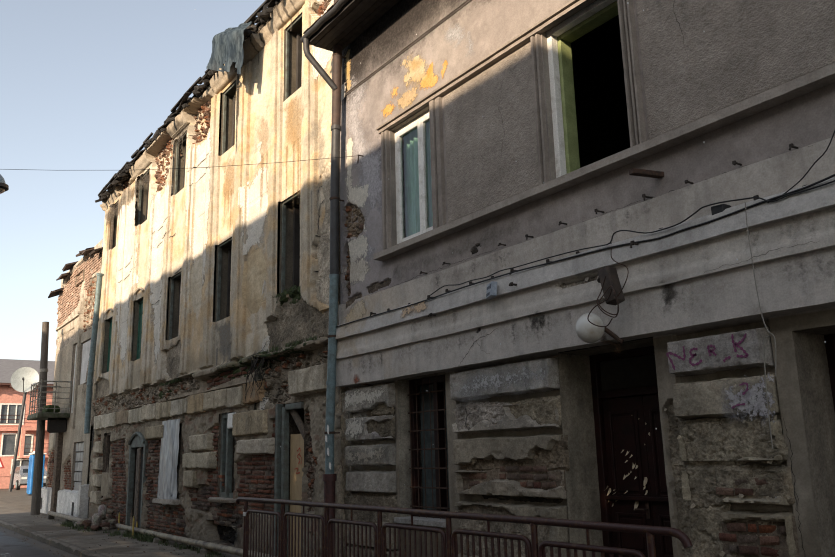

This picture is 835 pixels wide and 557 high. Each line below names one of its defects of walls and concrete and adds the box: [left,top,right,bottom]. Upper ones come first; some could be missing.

peeling [381,55,448,117]
leakage [286,100,301,194]
spalling [56,252,102,355]
peeling [83,96,391,427]
leakage [664,285,675,303]
spalling [97,440,133,526]
spalling [145,425,275,538]
spalling [305,412,318,512]
spalling [343,388,396,465]
spalling [455,364,570,557]
spalling [664,402,800,557]
peeling [725,374,776,422]